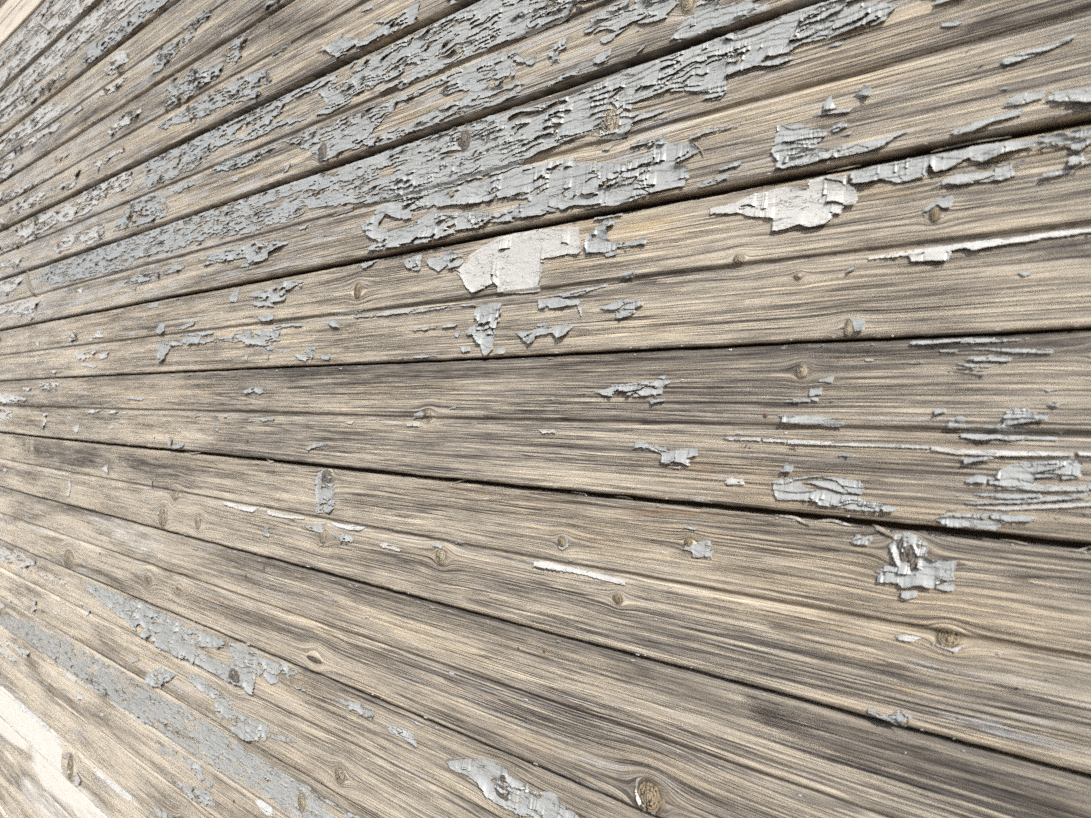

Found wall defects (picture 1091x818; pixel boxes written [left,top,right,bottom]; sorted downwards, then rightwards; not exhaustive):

peeling [952,86,1091,135]
peeling [0,0,909,368]
peeling [709,127,1091,231]
peeling [869,228,1091,261]
peeling [577,375,671,404]
peeling [778,376,845,427]
peeling [910,338,1053,374]
peeling [725,388,1091,531]
peeling [223,469,365,546]
peeling [876,532,957,599]
peeling [0,583,360,818]
peeling [447,759,579,818]